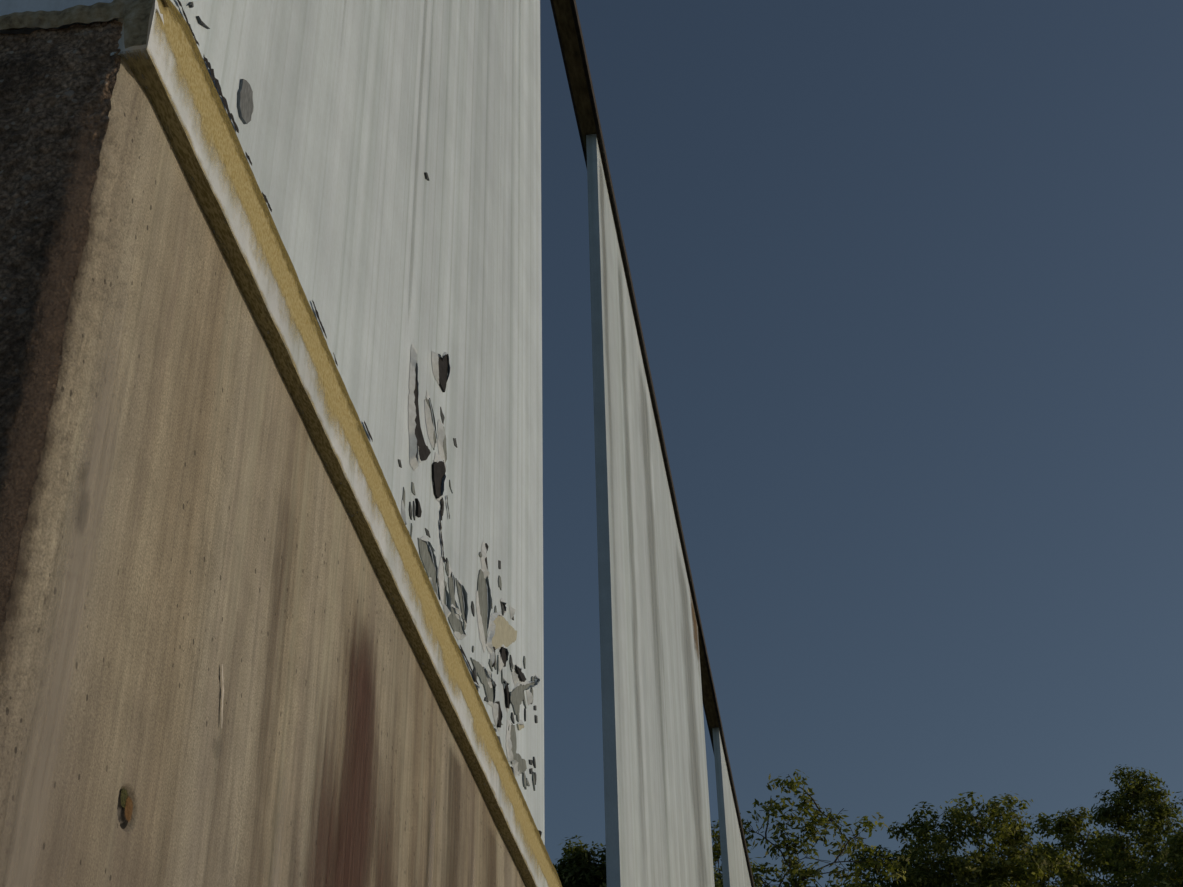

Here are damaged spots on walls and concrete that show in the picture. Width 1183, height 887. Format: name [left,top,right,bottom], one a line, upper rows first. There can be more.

spalling [0,0,169,546]
peeling [237,79,254,124]
corrosion [114,47,537,887]
peeling [398,344,540,791]